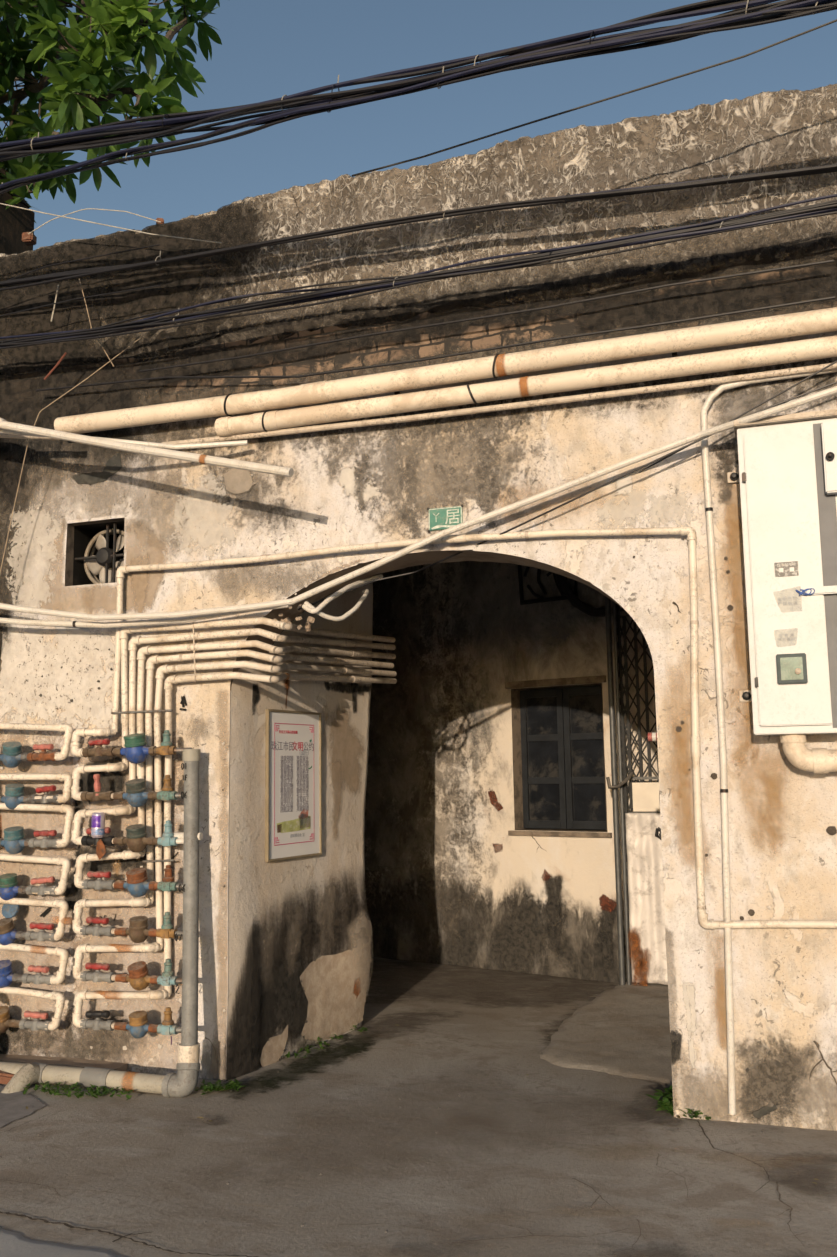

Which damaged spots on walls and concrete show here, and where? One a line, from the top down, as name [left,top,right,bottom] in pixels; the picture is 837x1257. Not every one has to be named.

water stain [0,199,837,672]
water stain [202,561,627,1082]
corrosion [629,930,650,986]
water stain [0,1016,135,1061]
flaking render [260,937,371,1067]
water stain [670,983,697,1068]
crack [809,1040,837,1084]